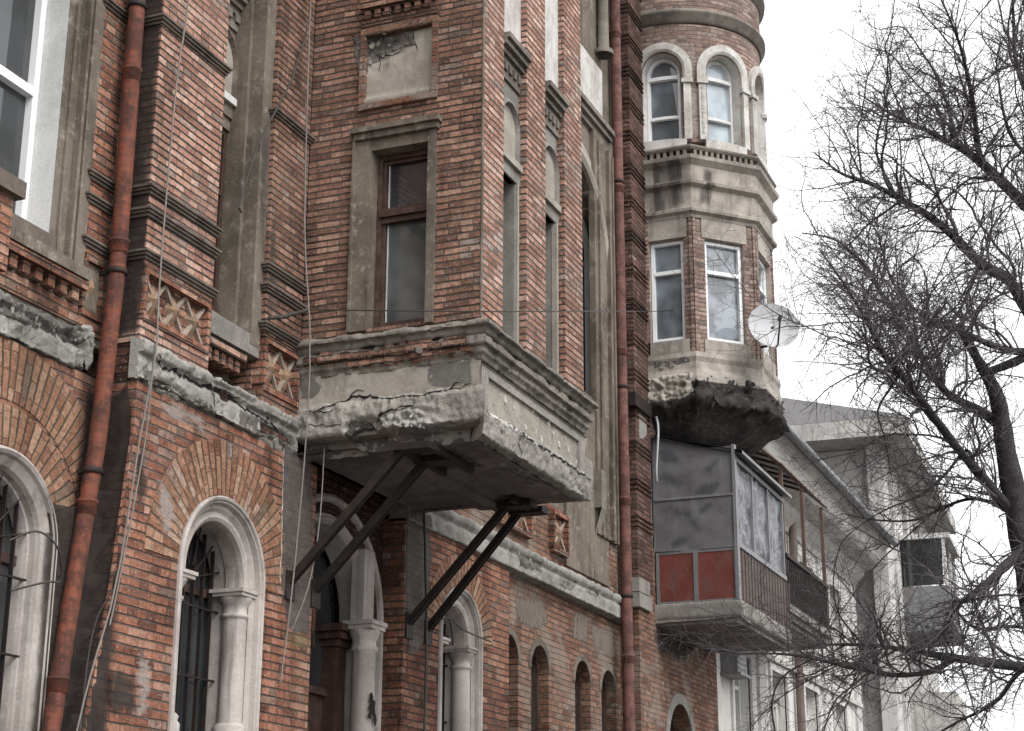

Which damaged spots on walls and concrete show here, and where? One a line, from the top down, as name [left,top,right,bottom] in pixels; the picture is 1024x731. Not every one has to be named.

peeling [353,30,414,71]
spalling [0,297,96,370]
spalling [143,370,217,415]
spalling [239,408,283,452]
crack [304,382,471,428]
spalling [345,408,440,447]
peeling [490,385,587,475]
spalling [648,357,694,403]